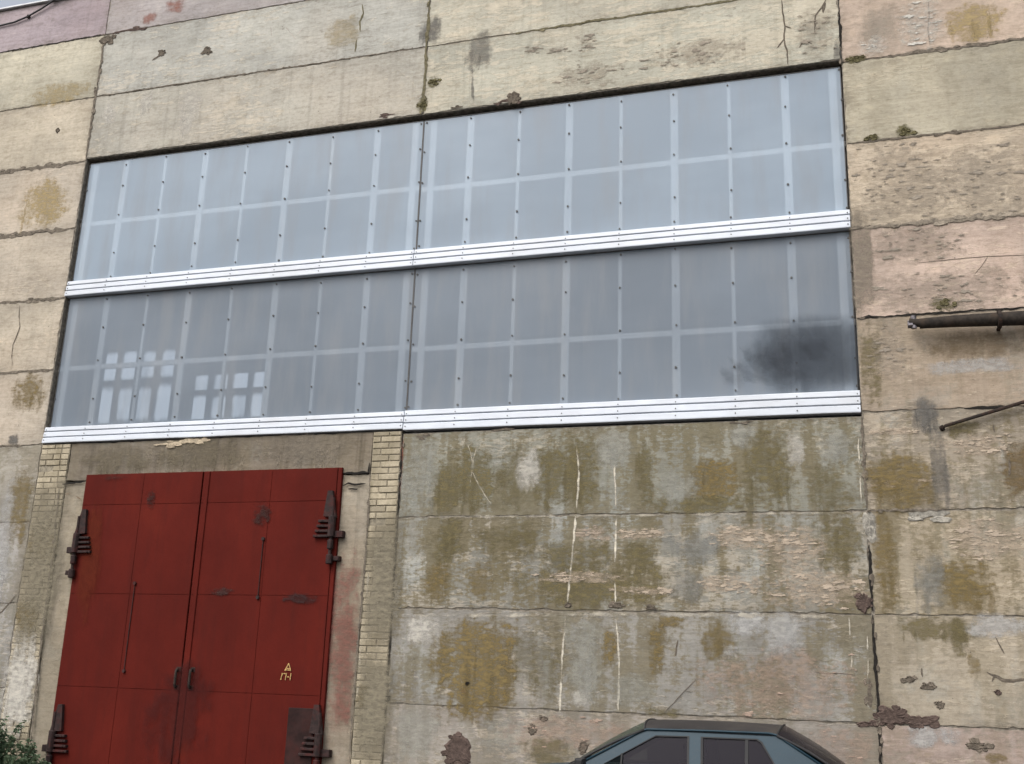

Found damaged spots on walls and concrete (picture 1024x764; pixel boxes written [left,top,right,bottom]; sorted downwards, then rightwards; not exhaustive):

crack [355,4,364,51]
crack [777,0,826,63]
spalling [154,437,210,448]
damp [518,451,538,484]
damp [567,455,580,602]
damp [408,616,436,642]
damp [731,613,798,651]
damp [970,616,1024,635]
damp [559,613,602,710]
spalling [854,665,945,754]
spalling [441,732,471,764]
spalling [965,737,994,752]